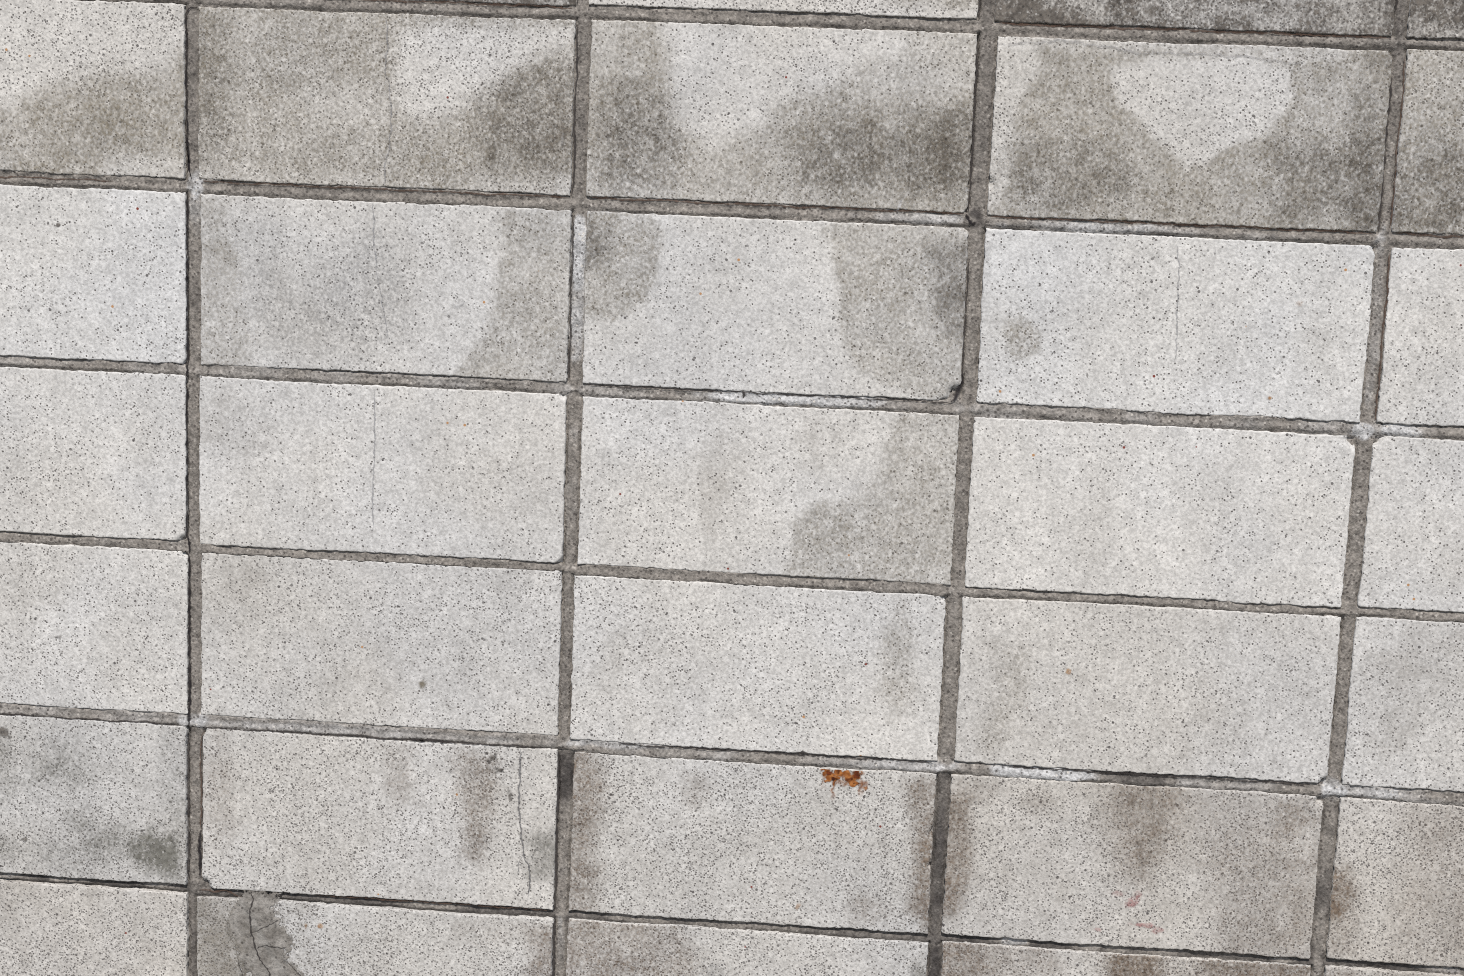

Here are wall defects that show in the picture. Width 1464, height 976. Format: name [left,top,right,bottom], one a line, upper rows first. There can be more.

damp [995,0,1464,58]
damp [13,53,231,172]
damp [394,68,571,188]
damp [777,94,973,209]
crack [592,46,1464,238]
damp [1010,53,1242,226]
damp [1217,71,1464,232]
crack [1375,254,1390,419]
crack [0,0,970,976]
rust [821,769,867,790]